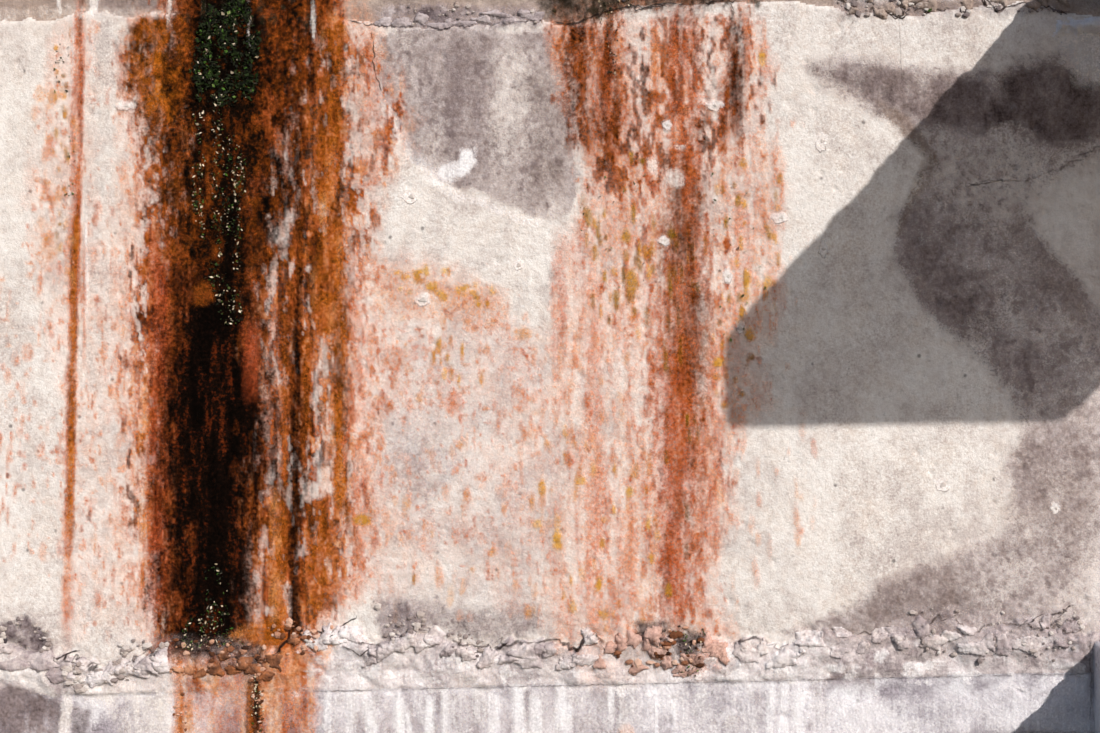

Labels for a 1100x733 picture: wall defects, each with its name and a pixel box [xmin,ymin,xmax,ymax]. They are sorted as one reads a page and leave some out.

spalling [837,0,1070,19]
damp [374,19,578,218]
corrosion [28,9,98,614]
corrosion [96,0,530,733]
damp [384,420,459,546]
corrosion [513,4,784,636]
damp [783,38,1100,733]
damp [382,599,542,643]
spalling [0,600,1087,733]